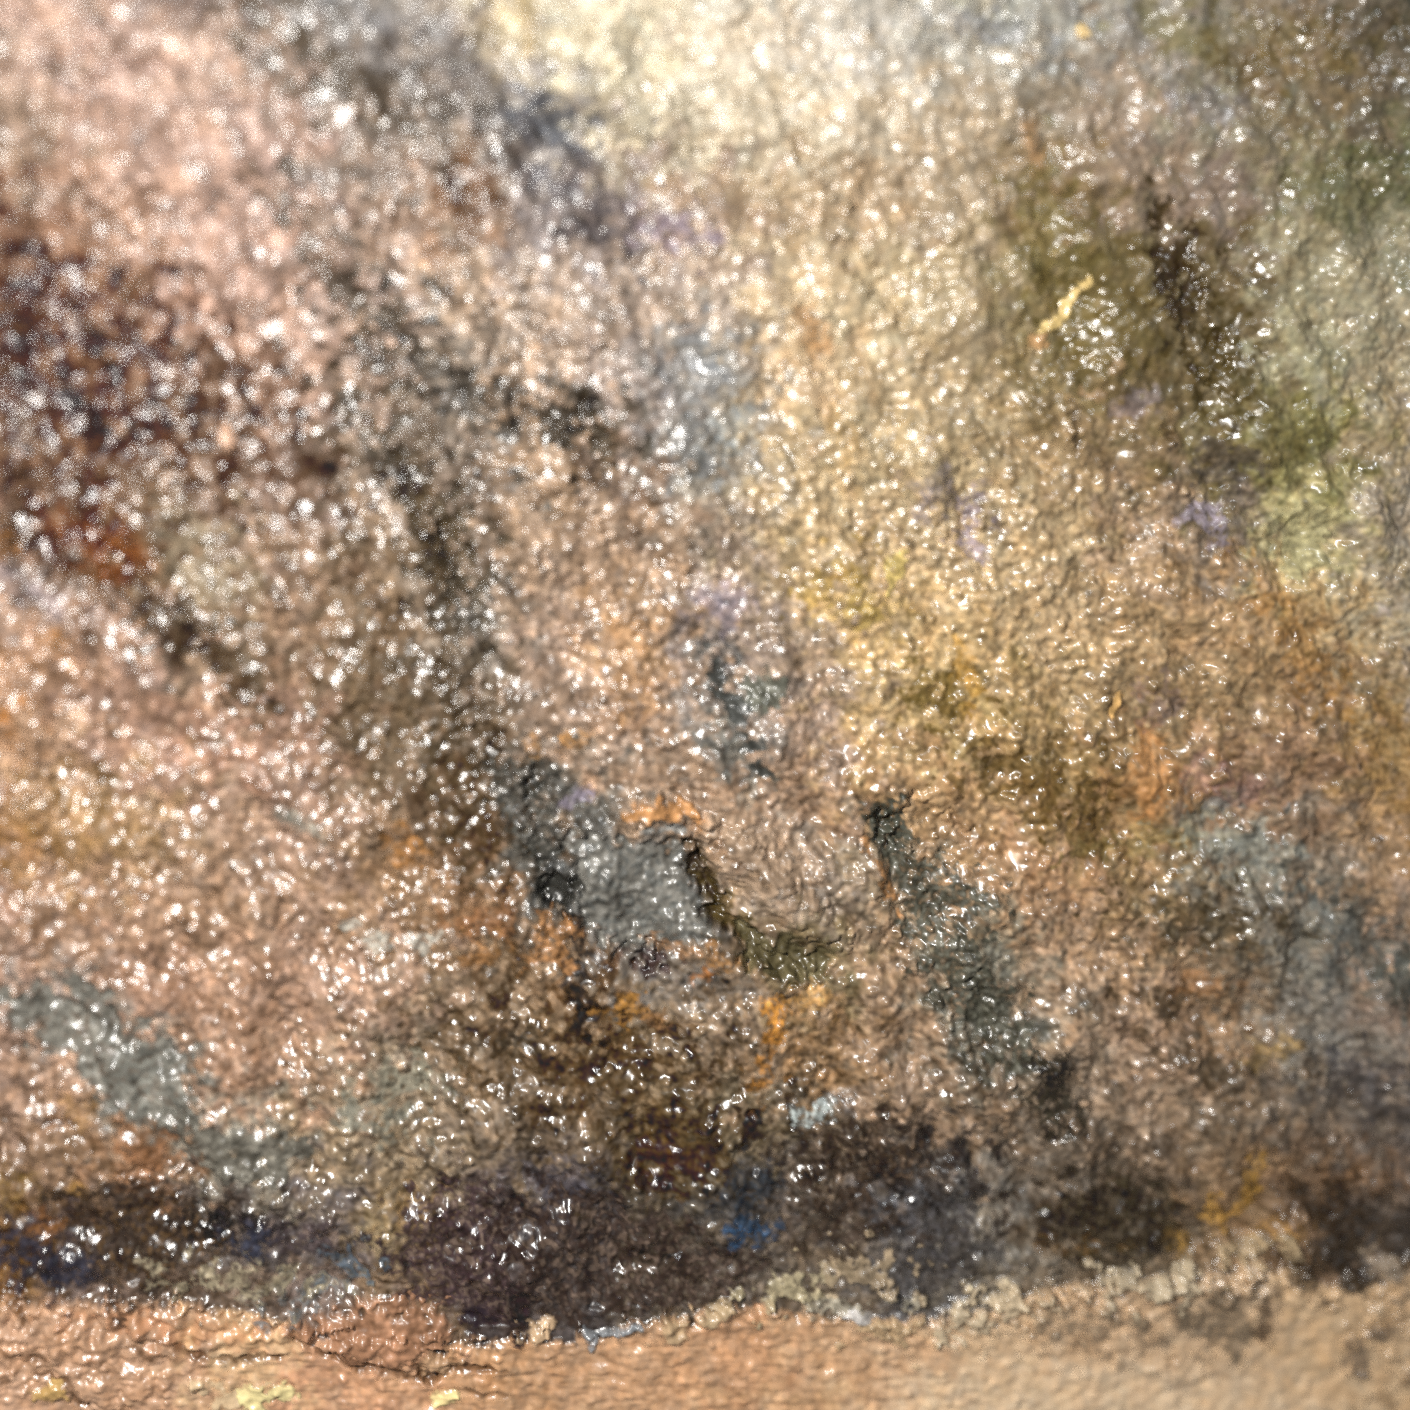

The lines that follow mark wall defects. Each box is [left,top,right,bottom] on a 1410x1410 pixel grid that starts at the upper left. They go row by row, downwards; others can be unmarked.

damp [1172,501,1227,547]
damp [339,919,444,956]
damp [0,1098,1061,1351]
damp [1037,1144,1410,1318]